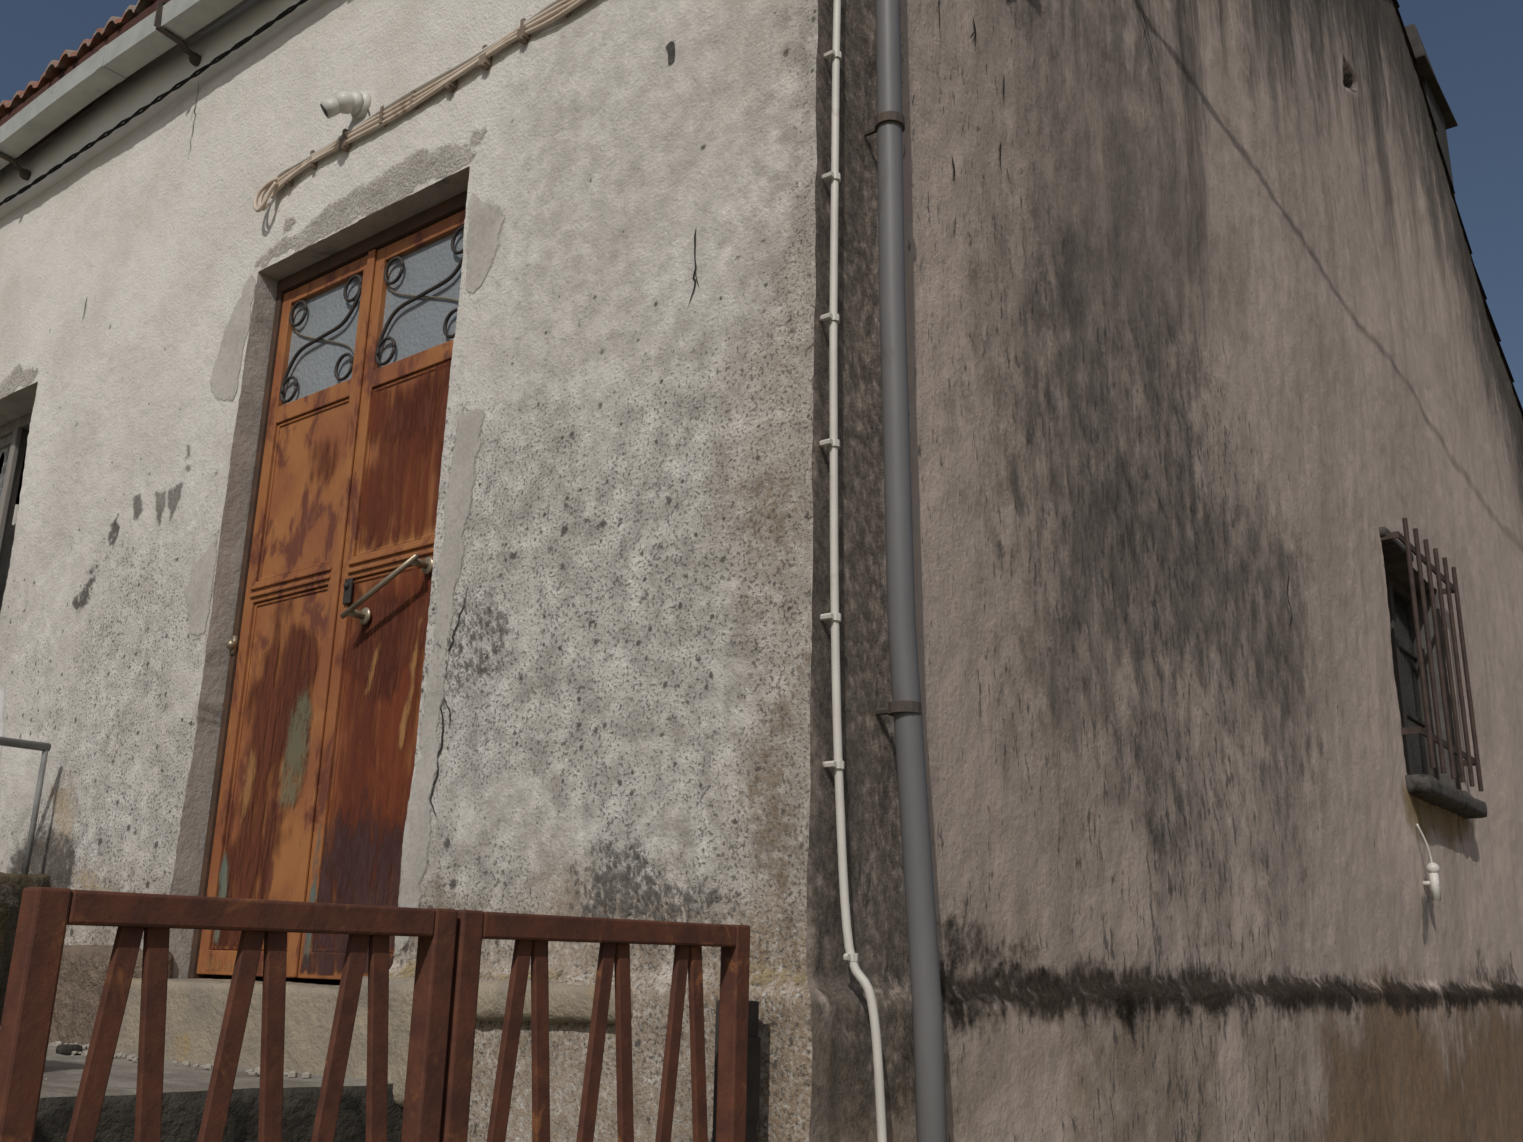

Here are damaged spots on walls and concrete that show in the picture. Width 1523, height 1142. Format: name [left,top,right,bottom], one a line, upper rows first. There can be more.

damp [1312,0,1523,451]
crack [429,581,469,817]
damp [1422,897,1430,945]